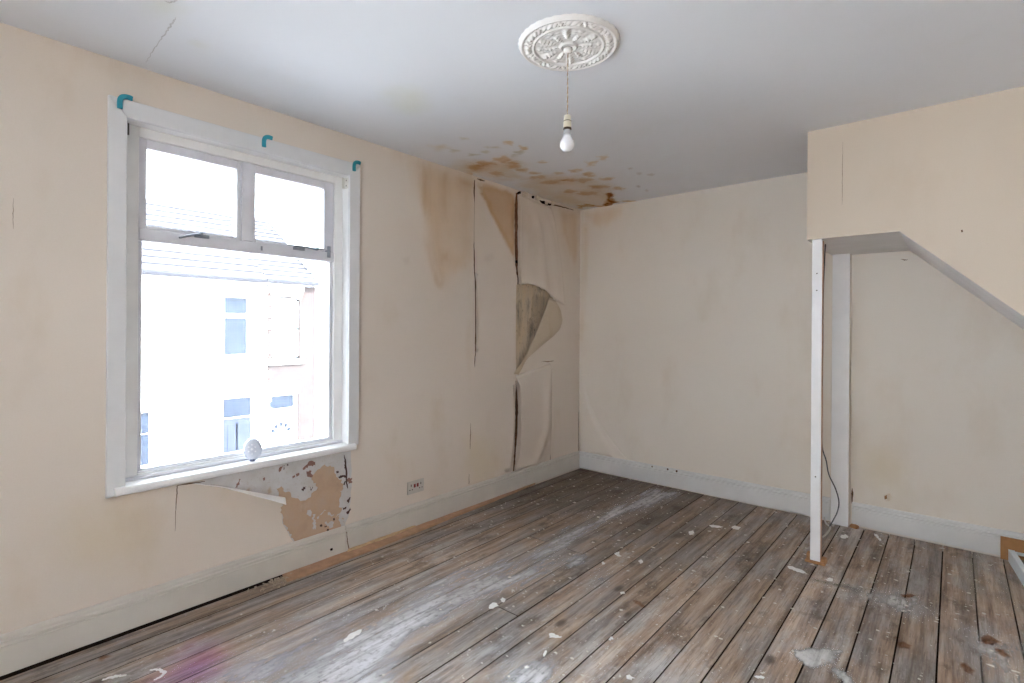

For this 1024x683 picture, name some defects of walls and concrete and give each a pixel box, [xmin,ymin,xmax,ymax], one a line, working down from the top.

flaking render [514,284,562,375]
peeling [193,451,352,542]